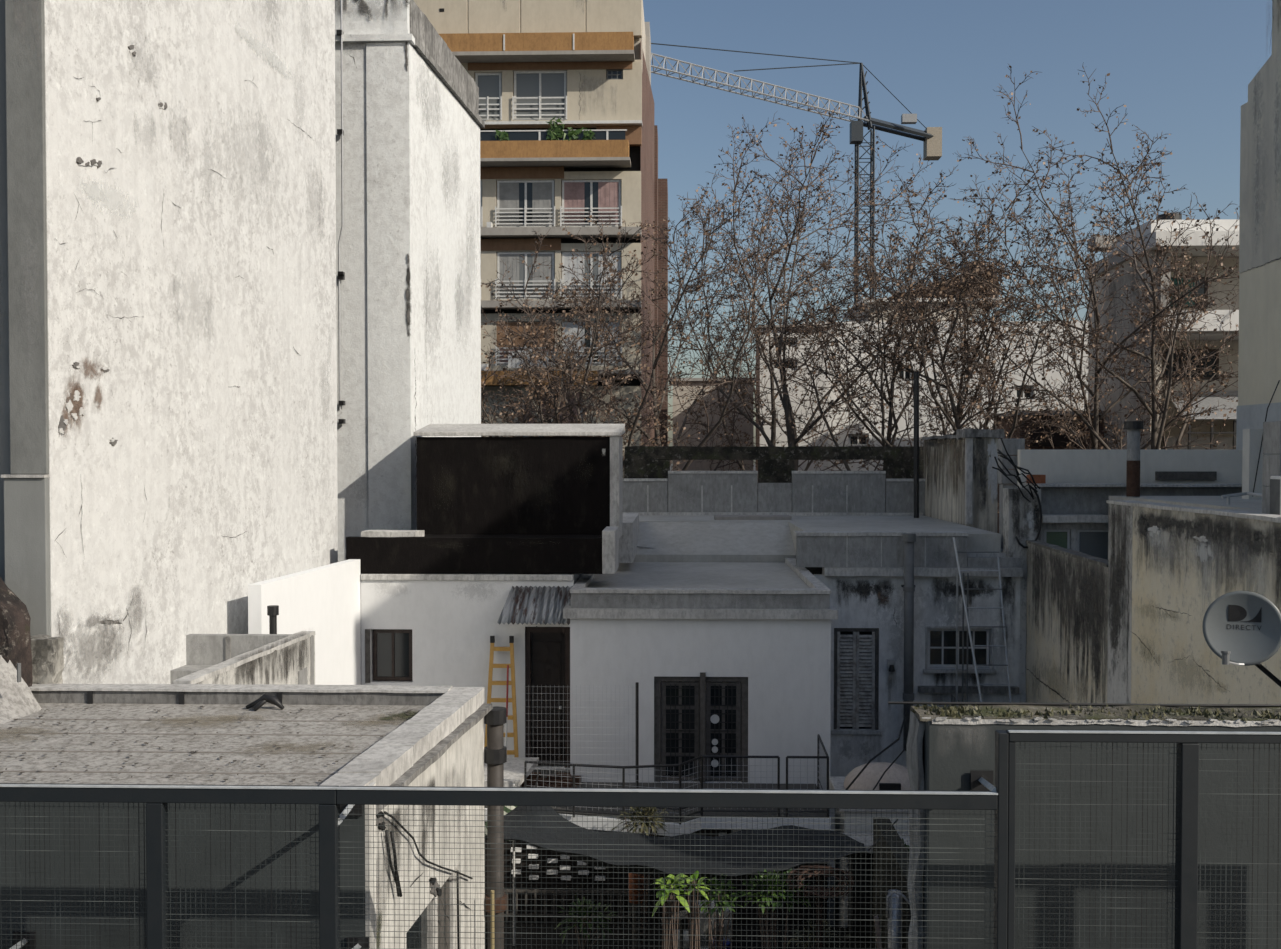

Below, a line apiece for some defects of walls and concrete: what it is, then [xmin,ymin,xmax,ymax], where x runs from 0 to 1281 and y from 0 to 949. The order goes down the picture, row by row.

peeling [58,390,85,435]
water stain [837,580,891,602]
water stain [935,577,1014,613]
water stain [1033,512,1281,686]